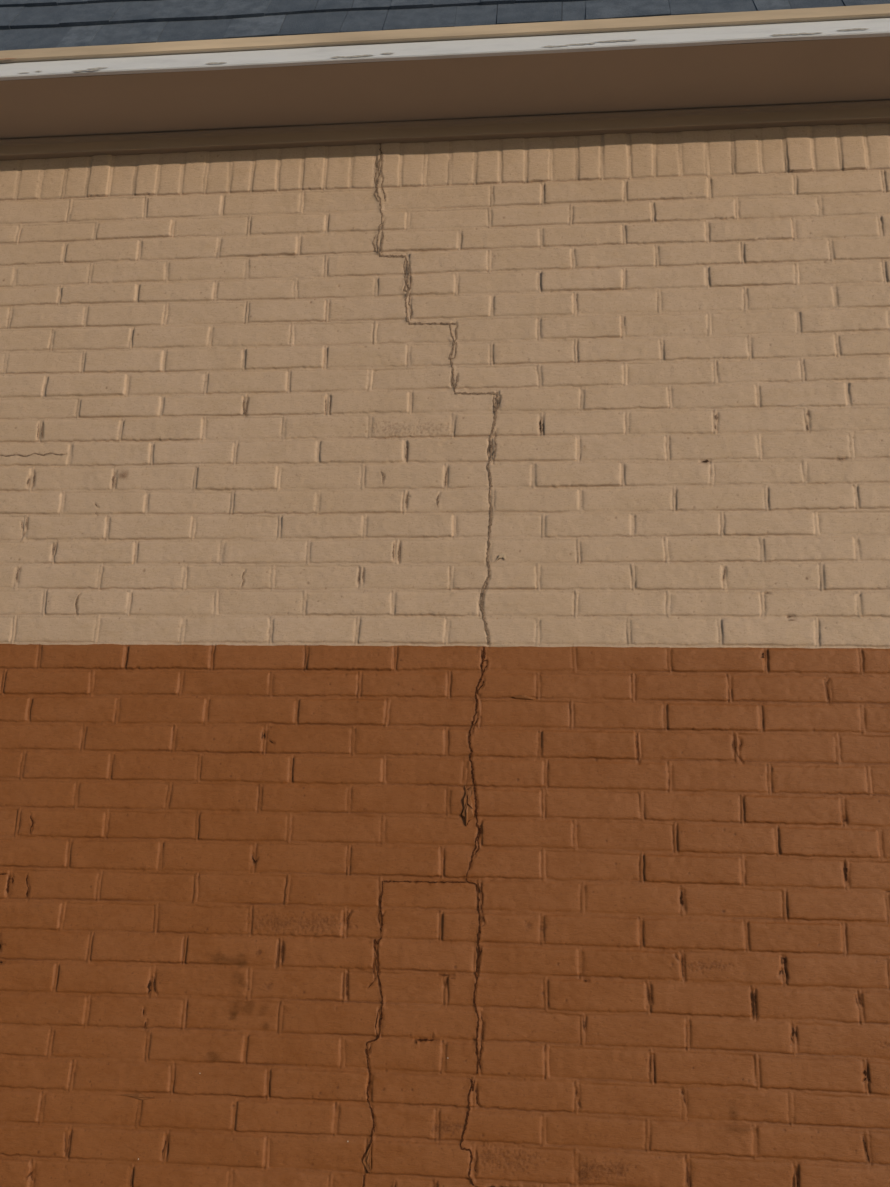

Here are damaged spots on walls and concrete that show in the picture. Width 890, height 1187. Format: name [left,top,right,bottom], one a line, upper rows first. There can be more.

crack [1,451,64,459]
crack [362,143,503,1187]
crack [0,873,29,897]